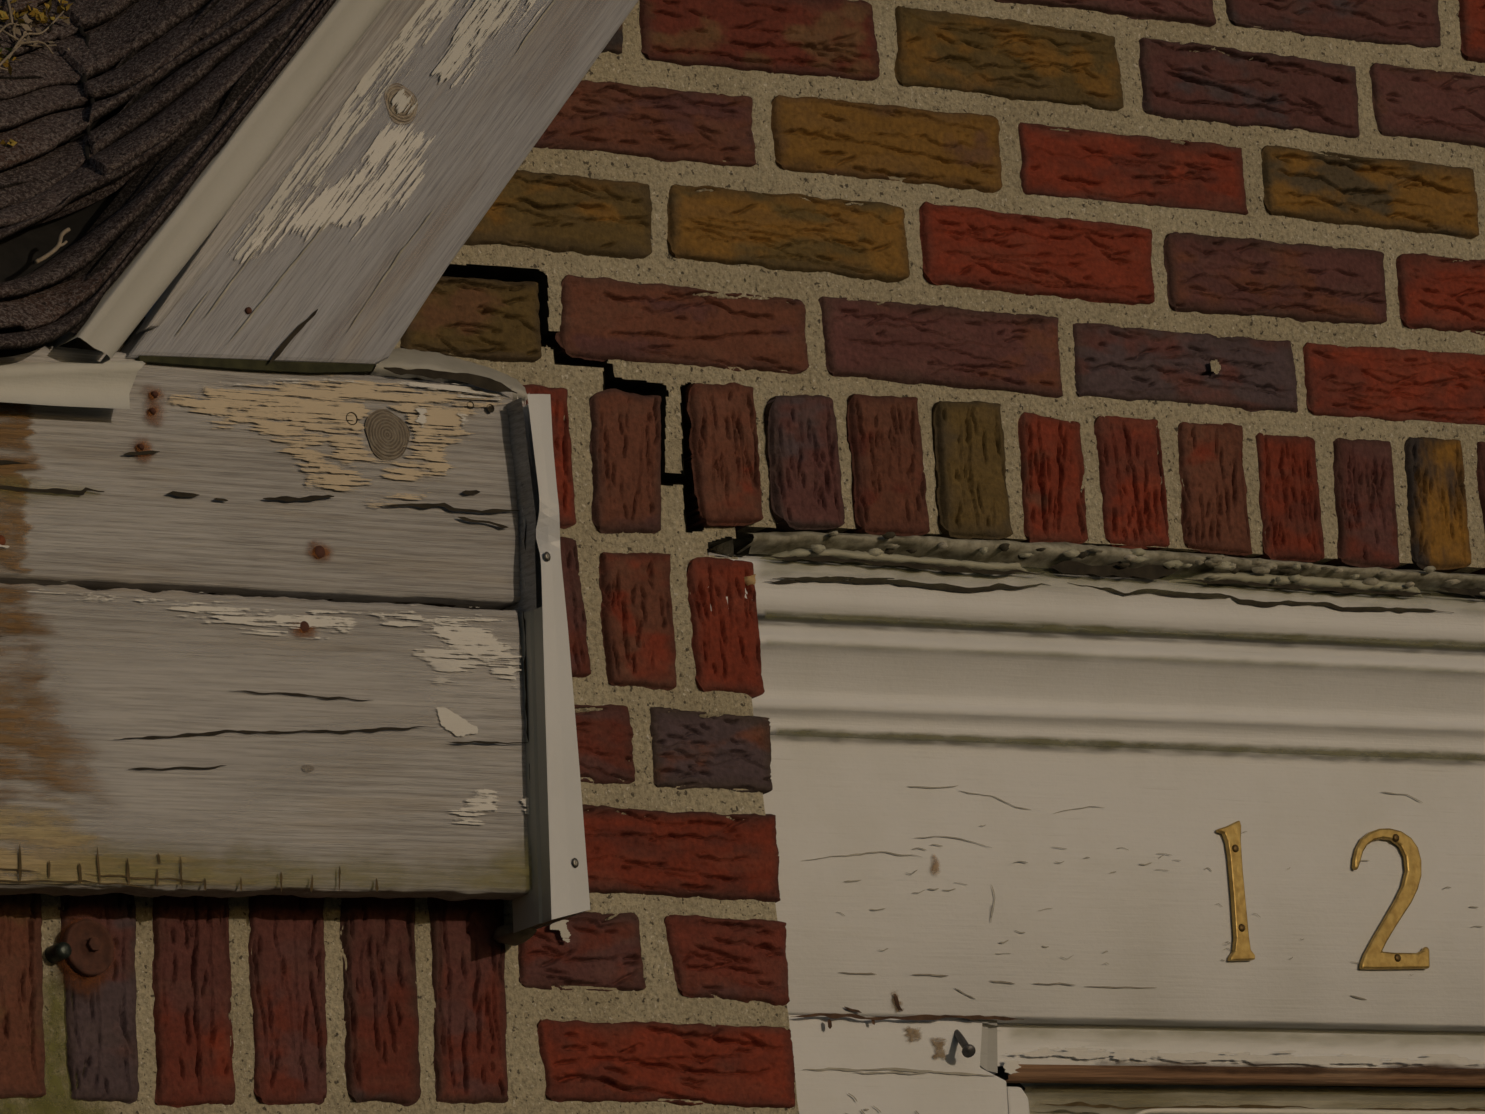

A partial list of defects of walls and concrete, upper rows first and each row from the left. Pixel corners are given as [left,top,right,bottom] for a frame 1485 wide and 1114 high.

peeling [227,0,549,264]
crack [135,206,519,399]
crack [0,460,104,495]
crack [123,449,160,457]
crack [167,491,228,501]
crack [263,494,334,502]
peeling [167,373,533,510]
crack [379,487,527,550]
crack [442,264,1485,613]
damp [0,402,254,884]
peeling [27,579,524,825]